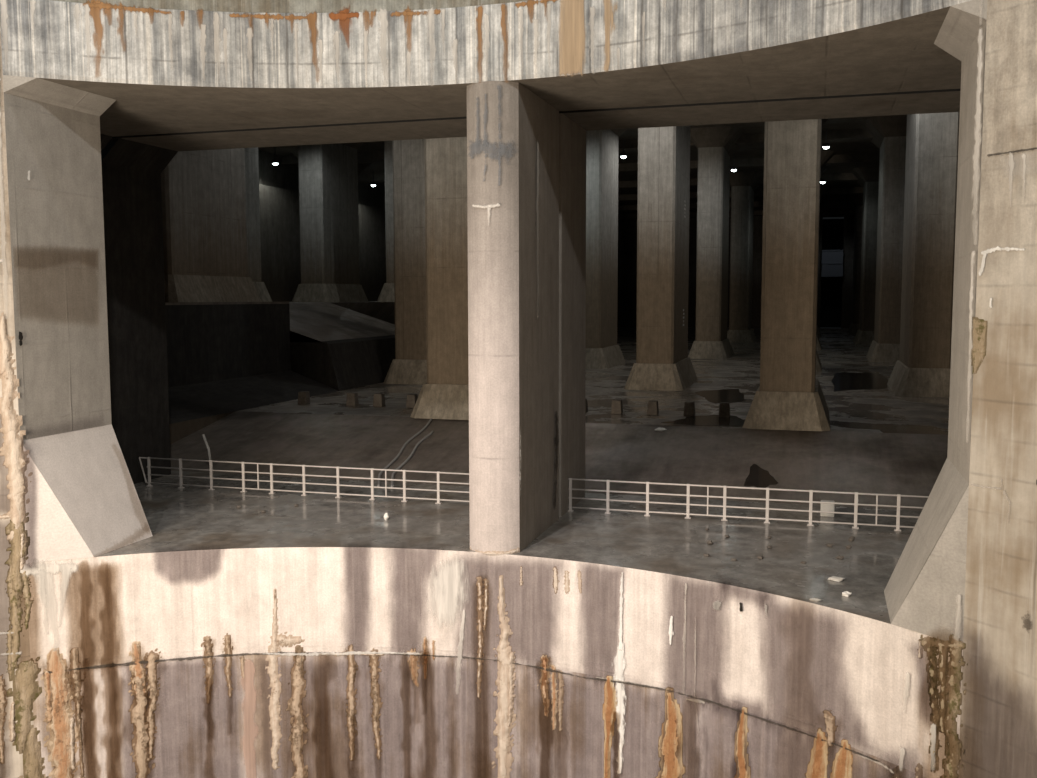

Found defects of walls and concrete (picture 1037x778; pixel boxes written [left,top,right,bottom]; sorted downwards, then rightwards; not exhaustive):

corrosion [83,0,184,58]
corrosion [230,8,376,63]
corrosion [391,7,441,45]
corrosion [501,0,585,75]
corrosion [604,0,617,71]
damp [0,312,86,778]
damp [128,641,161,778]
damp [201,633,246,704]
damp [265,589,436,778]
damp [429,560,516,778]
damp [596,572,647,778]
damp [891,634,968,778]